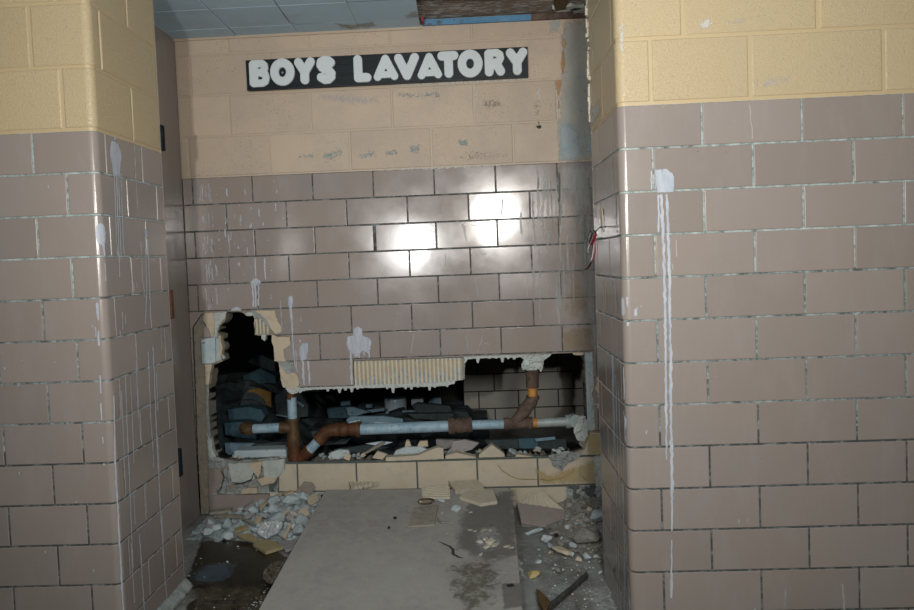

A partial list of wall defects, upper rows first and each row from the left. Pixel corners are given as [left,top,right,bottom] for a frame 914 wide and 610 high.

spalling [245,310,519,394]
spalling [203,311,294,533]
spalling [386,443,533,461]
spalling [549,431,602,499]
water stain [187,539,288,610]